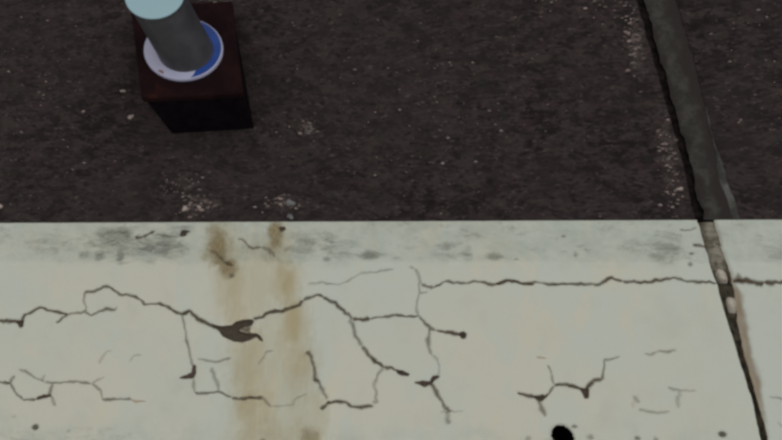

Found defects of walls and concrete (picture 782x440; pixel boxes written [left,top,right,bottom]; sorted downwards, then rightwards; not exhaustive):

corrosion [210,232,234,274]
crack [423,276,782,288]
crack [0,286,215,328]
spalling [211,319,262,342]
crack [254,294,460,371]
crack [195,391,263,400]
crack [320,400,373,410]
crack [431,380,451,412]
crack [518,365,605,403]